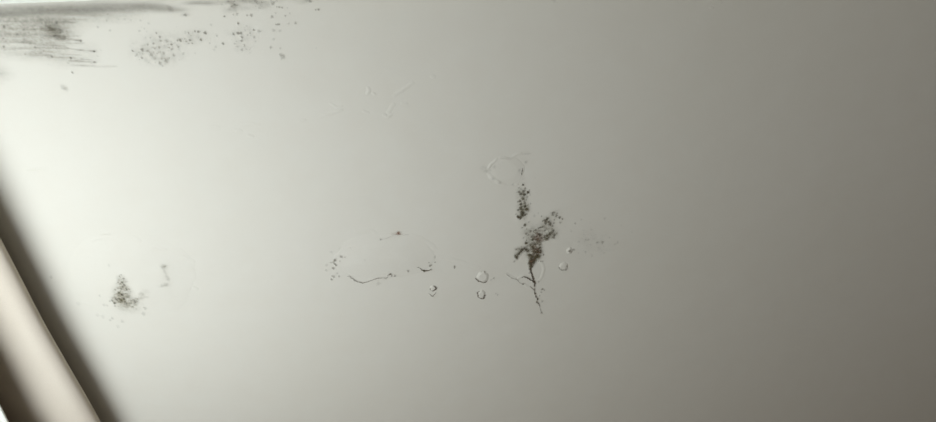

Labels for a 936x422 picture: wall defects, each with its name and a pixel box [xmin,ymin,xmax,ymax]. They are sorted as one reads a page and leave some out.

leakage [0,8,103,37]